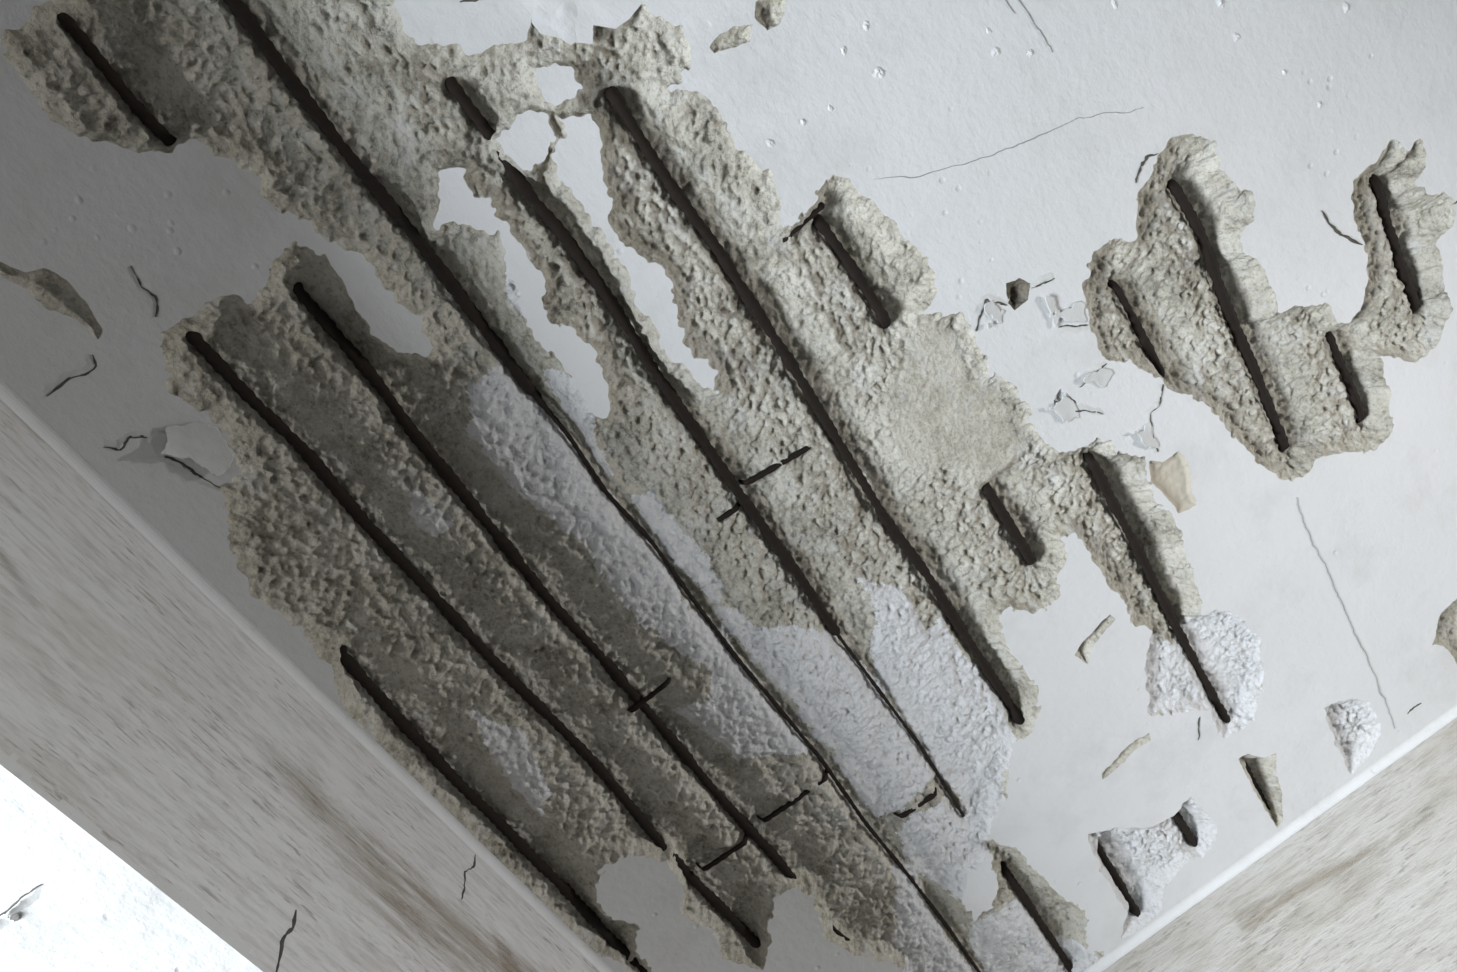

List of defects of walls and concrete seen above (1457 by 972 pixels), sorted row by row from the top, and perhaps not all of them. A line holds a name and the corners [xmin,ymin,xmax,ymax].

crack [1005,0,1052,52]
crack [881,107,1143,179]
crack [1135,153,1158,183]
spalling [0,262,103,340]
spalling [1045,134,1457,481]
peeling [147,422,234,476]
spalling [223,0,1265,972]
spalling [1432,599,1457,663]
spalling [1323,698,1381,774]
spalling [1239,753,1283,828]